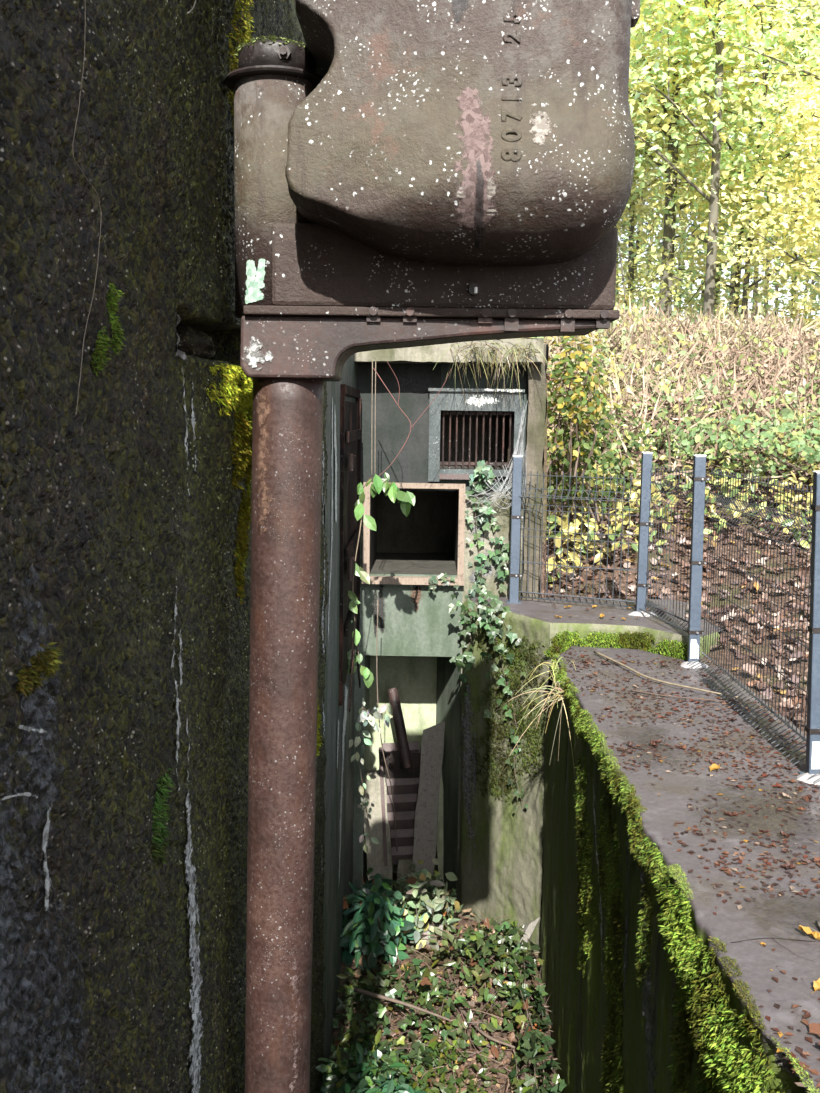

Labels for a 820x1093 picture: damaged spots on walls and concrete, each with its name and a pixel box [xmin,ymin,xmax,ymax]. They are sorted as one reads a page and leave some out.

corrosion [452,0,467,22]
corrosion [454,87,497,248]
corrosion [256,394,274,532]
leakage [321,399,337,659]
leakage [171,586,203,1093]
leakage [337,688,348,879]